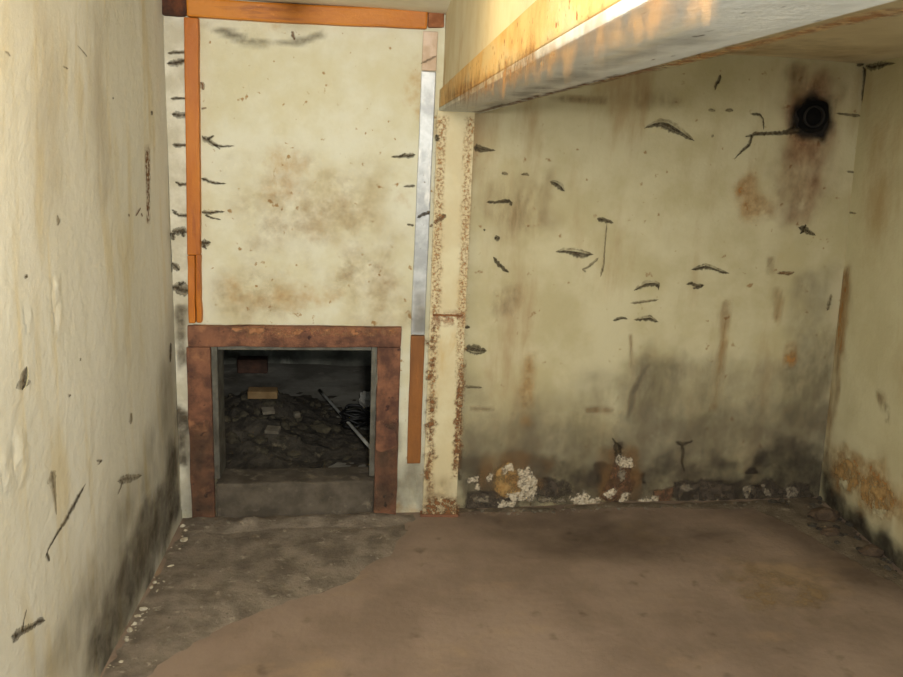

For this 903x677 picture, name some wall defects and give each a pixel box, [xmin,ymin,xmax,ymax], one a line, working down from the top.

crack [726,110,801,156]
rust [424,9,903,487]
crack [46,472,84,561]
leakage [95,408,204,667]
rust [423,497,459,514]
leakage [463,438,699,504]